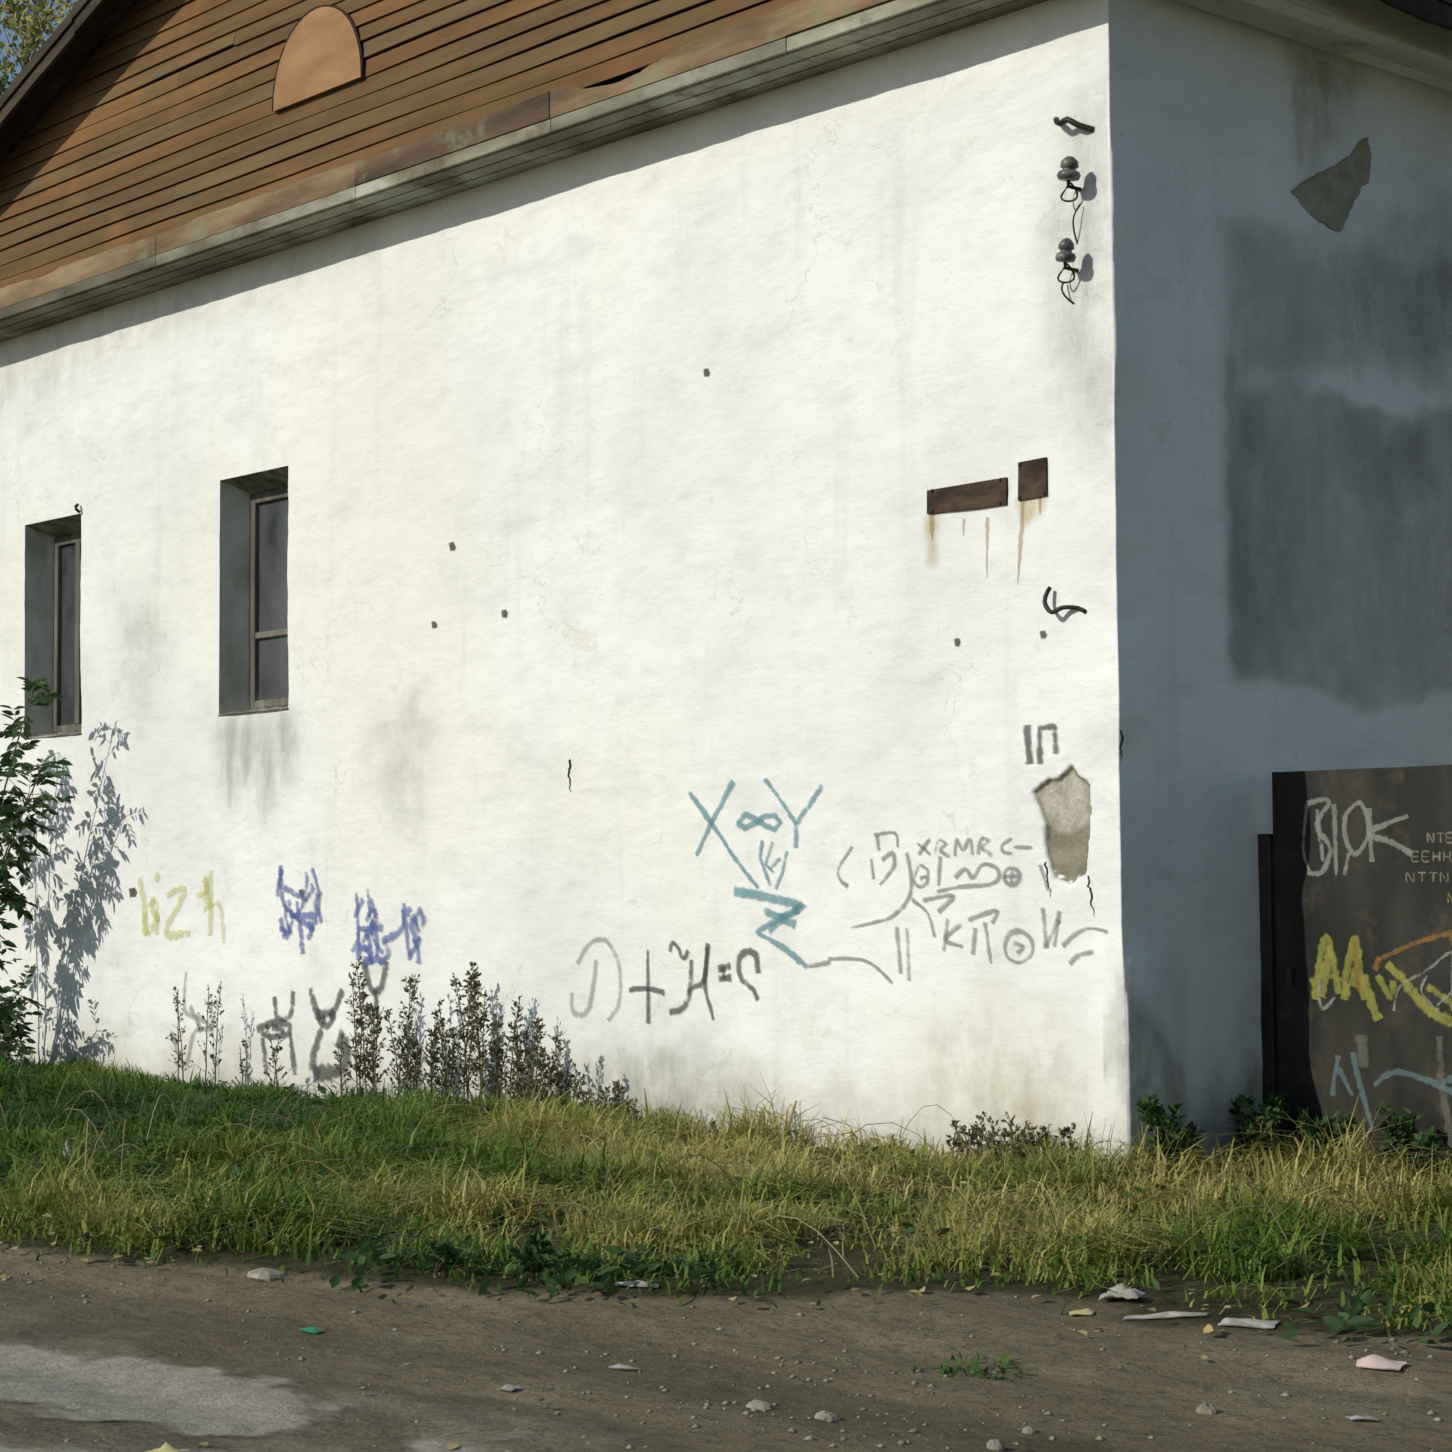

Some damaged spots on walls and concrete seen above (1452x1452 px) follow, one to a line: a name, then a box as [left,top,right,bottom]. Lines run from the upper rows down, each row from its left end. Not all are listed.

flaking render [1291,138,1371,232]
flaking render [1035,766,1092,882]